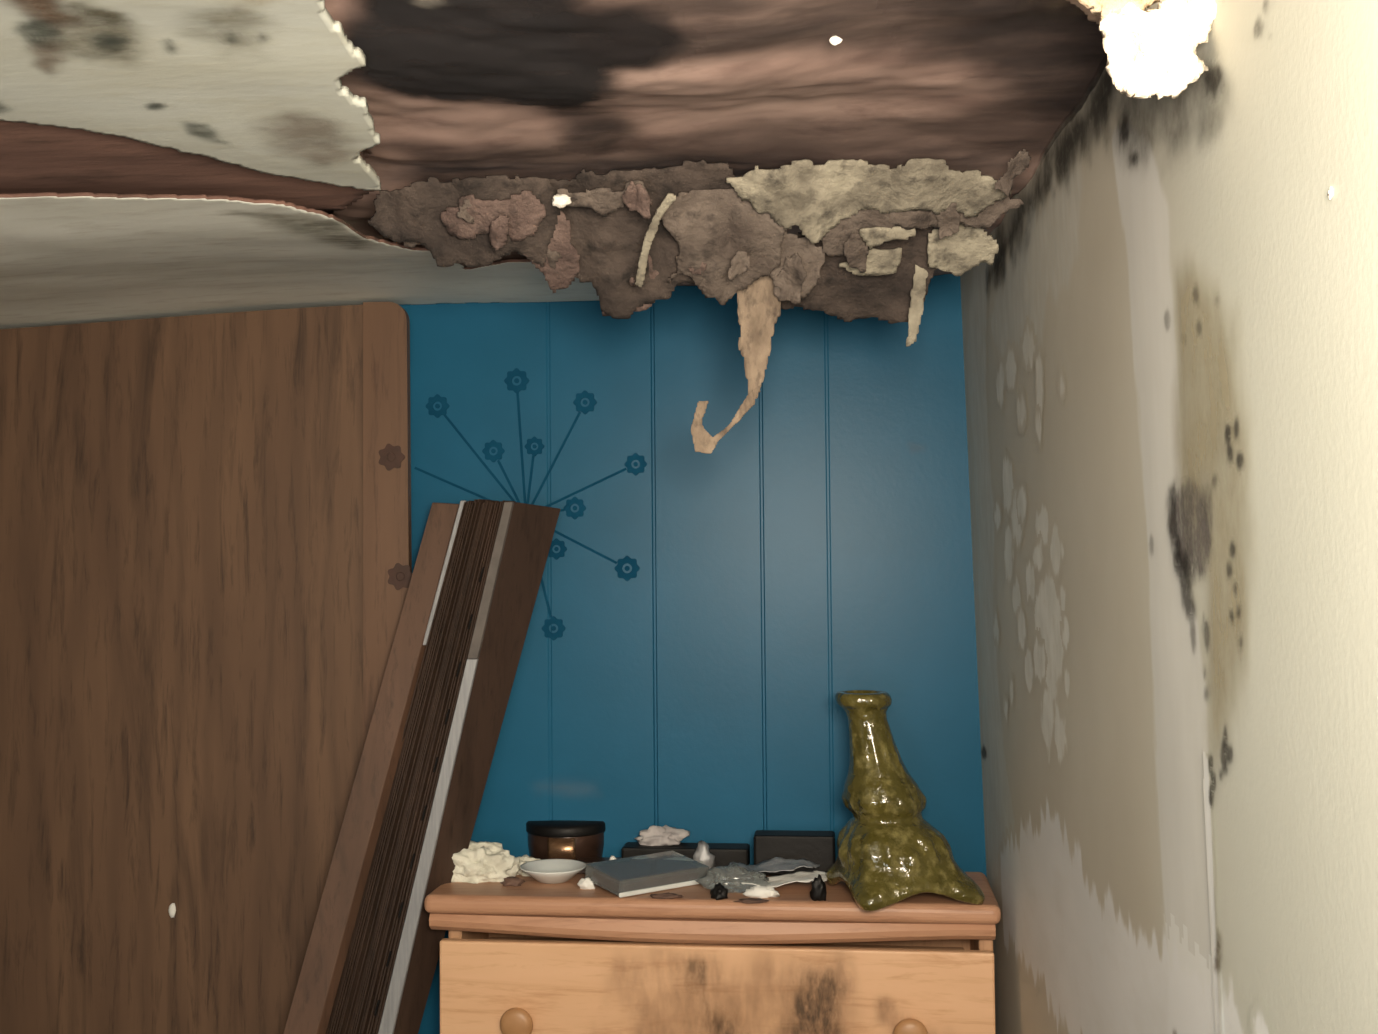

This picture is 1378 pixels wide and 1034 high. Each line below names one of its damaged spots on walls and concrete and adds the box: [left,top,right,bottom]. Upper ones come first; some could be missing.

spalling [325,0,365,35]
leakage [346,0,1149,287]
spalling [333,0,1217,454]
leakage [1206,68,1221,93]
leakage [1169,286,1243,703]
leakage [1209,729,1232,804]